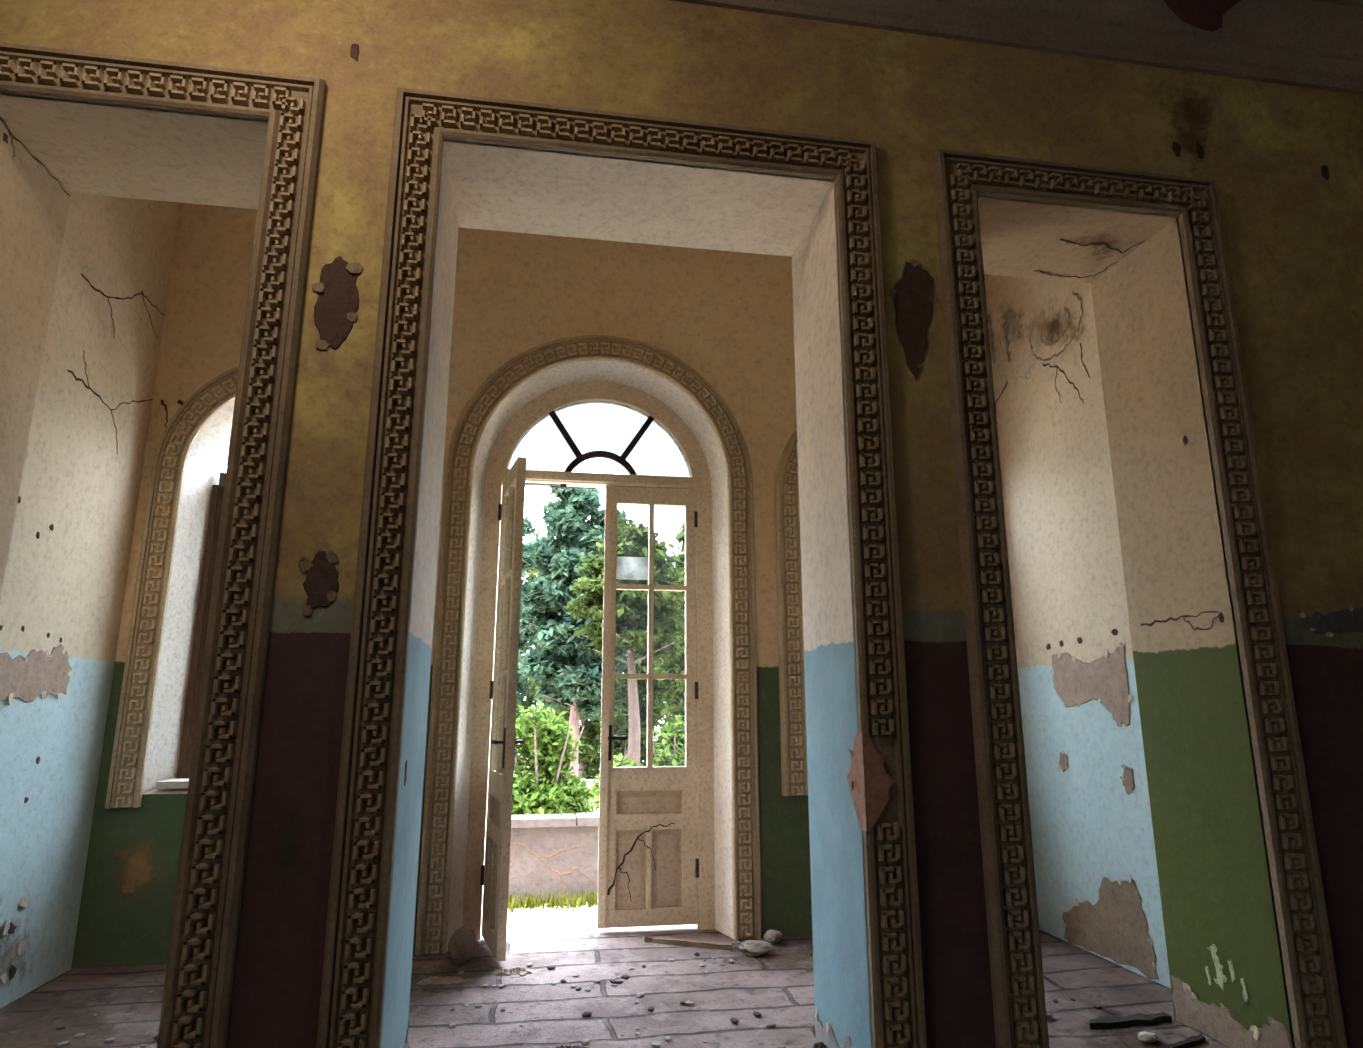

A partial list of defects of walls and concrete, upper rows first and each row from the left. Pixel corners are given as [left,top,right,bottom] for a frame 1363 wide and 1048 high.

crack [81,273,165,338]
spalling [311,256,363,350]
spalling [889,260,939,380]
crack [1035,261,1118,278]
crack [67,350,184,454]
crack [1042,343,1090,403]
peeling [0,644,72,706]
peeling [1050,641,1131,727]
peeling [0,920,26,984]
spalling [1062,873,1292,1048]